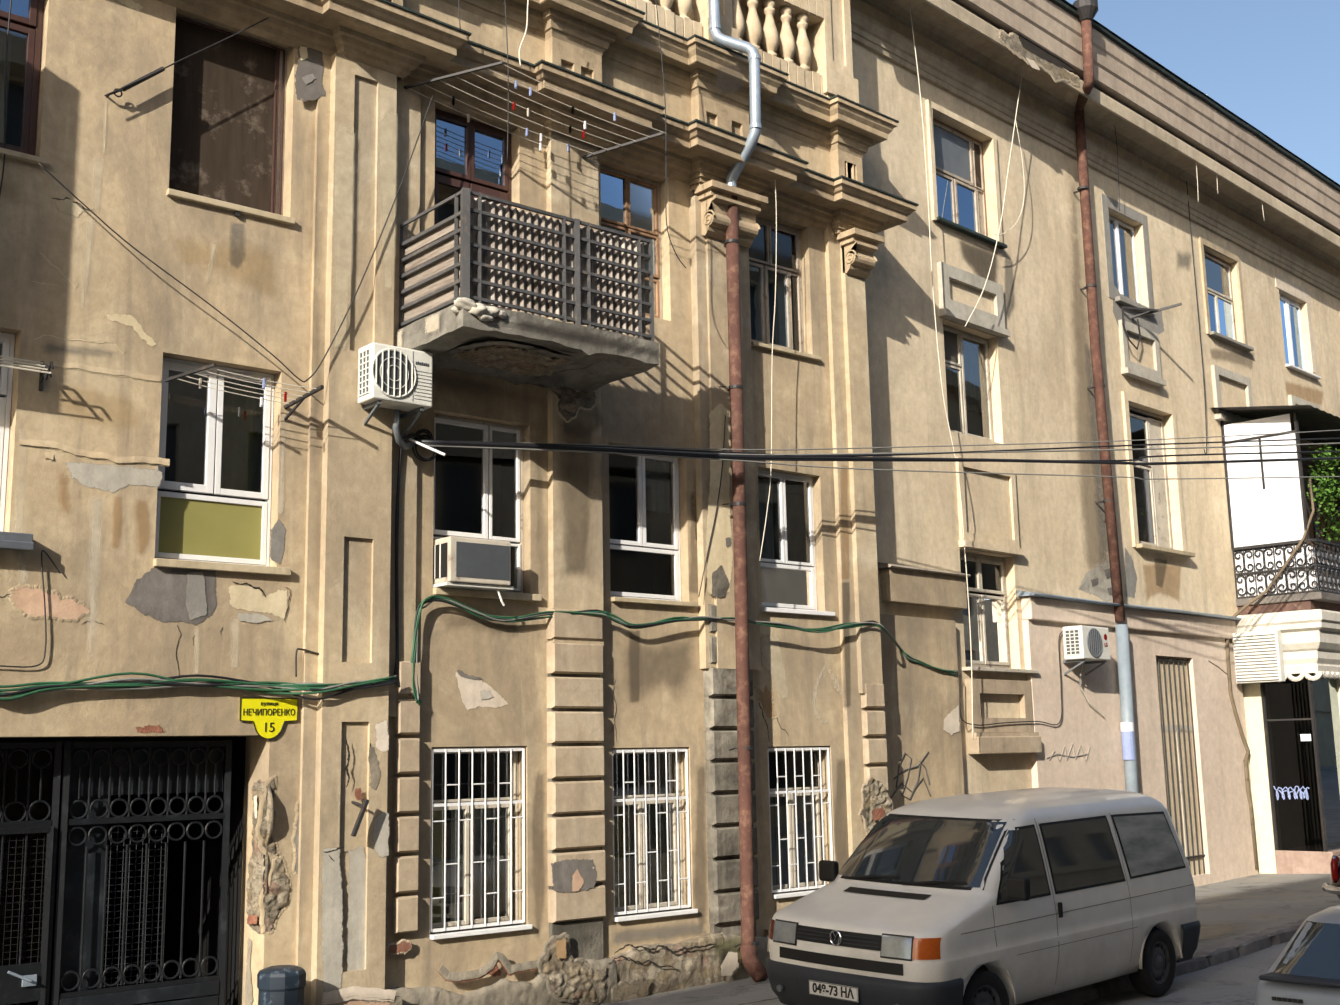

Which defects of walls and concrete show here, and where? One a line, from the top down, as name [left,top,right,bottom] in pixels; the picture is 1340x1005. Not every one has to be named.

flaking render [295,46,326,102]
peeling [999,29,1080,87]
peeling [66,462,163,493]
flaking render [8,583,91,623]
peeling [125,567,288,625]
flaking render [455,670,508,711]
flaking render [858,777,894,833]
flaking render [245,775,300,1005]
peeling [321,812,391,1005]
flaking render [551,859,597,893]
flaking render [386,939,413,955]
flaking render [437,932,652,1005]